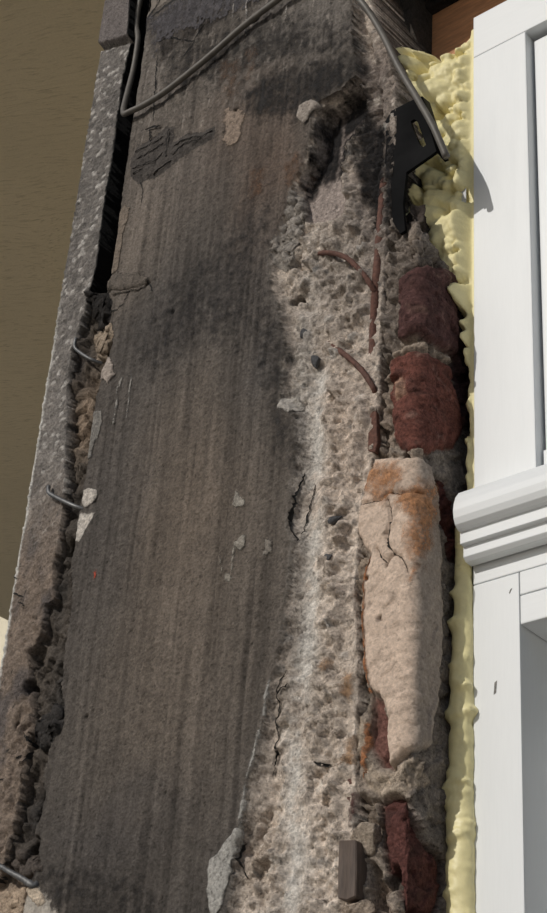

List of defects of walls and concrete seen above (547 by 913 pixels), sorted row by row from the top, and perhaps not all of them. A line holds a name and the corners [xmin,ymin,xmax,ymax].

peeling [88,410,102,459]
spalling [207,0,432,913]
peeling [75,488,97,541]
crack [288,473,316,541]
crack [363,492,408,571]
rust [365,463,437,578]
crack [273,670,288,776]
flaking render [23,887,57,913]